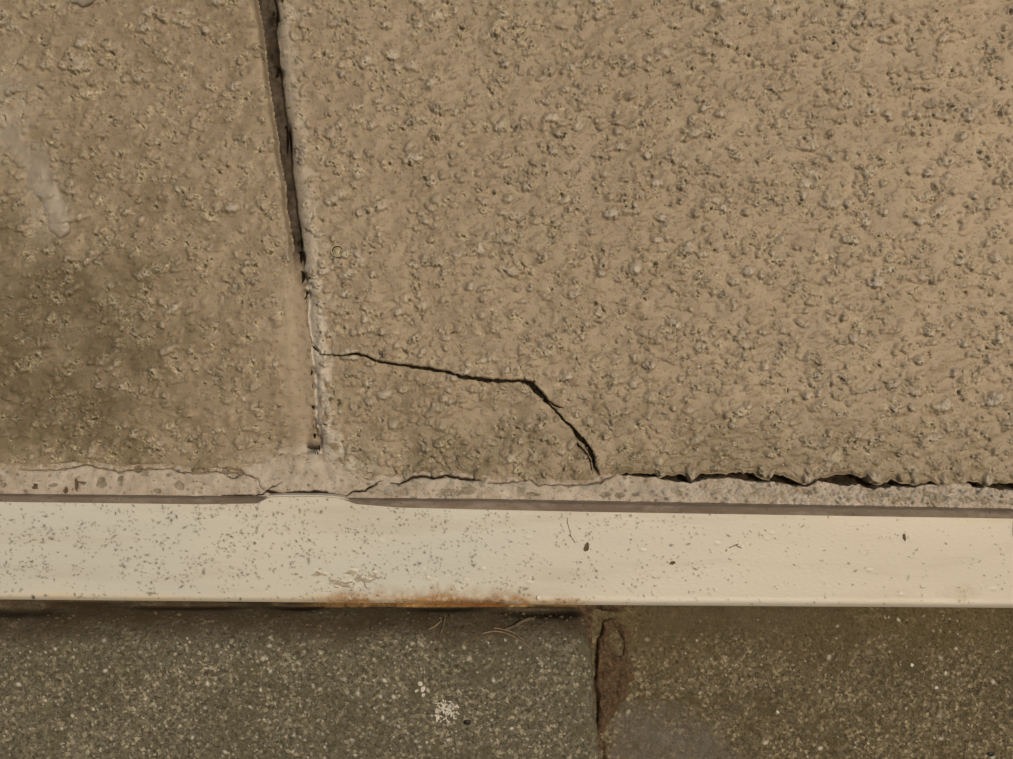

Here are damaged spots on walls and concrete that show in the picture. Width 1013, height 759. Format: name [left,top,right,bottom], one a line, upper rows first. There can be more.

crack [23,345,615,496]